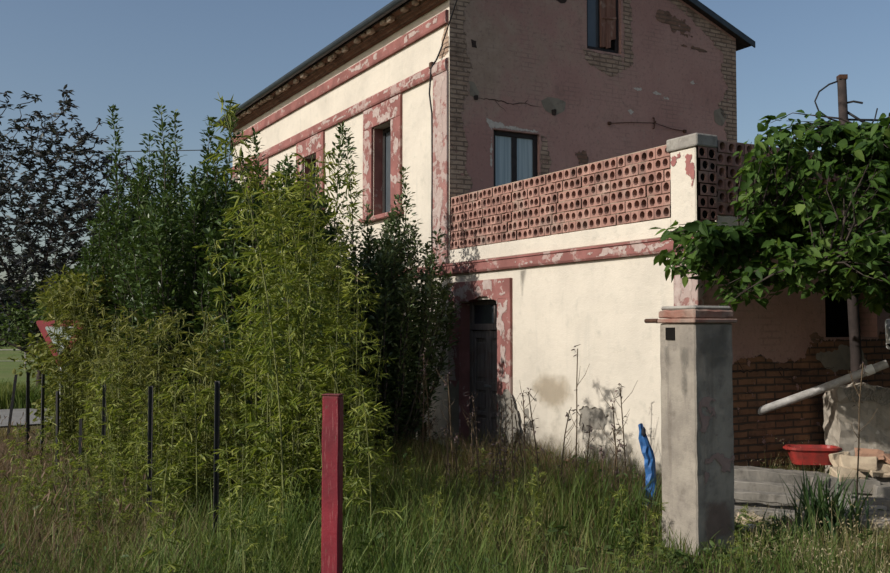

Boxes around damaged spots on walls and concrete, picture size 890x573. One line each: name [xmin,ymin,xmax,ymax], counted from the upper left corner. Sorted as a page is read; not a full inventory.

flaking render [655,0,737,142]
flaking render [297,0,478,232]
flaking render [486,118,538,168]
flaking render [575,150,589,166]
peeling [670,152,695,186]
peeling [587,240,671,257]
flaking render [448,279,536,451]
flaking render [861,328,890,388]
flaking render [580,406,622,435]
flaking render [732,332,851,473]